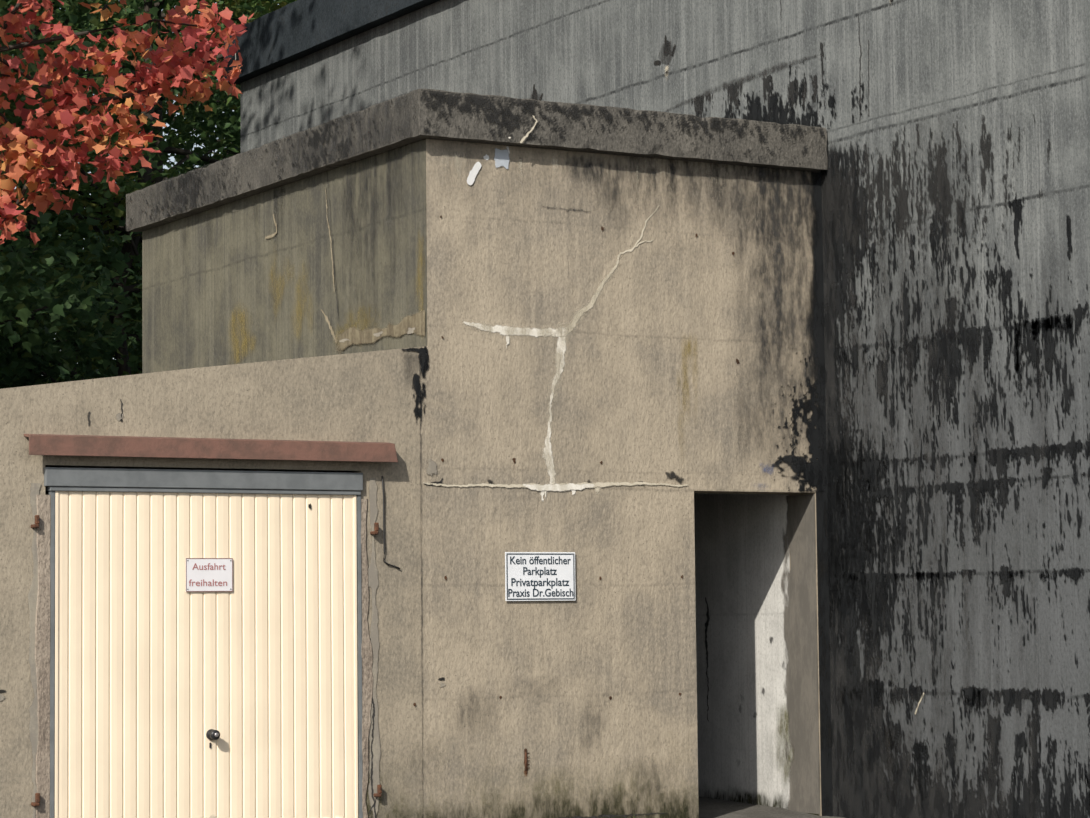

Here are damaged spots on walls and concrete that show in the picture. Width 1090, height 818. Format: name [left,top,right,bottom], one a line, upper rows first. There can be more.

spalling [336,310,425,353]
crack [463,205,660,485]
leakage [402,346,429,423]
leakage [740,115,1090,818]
leakage [536,799,698,818]
leakage [698,791,783,808]